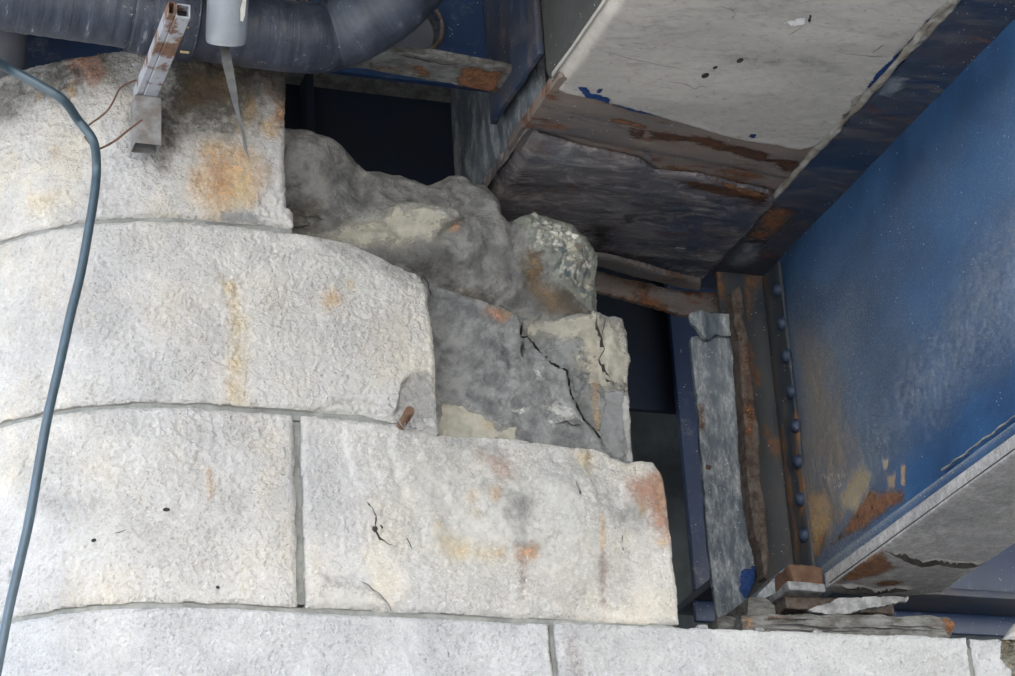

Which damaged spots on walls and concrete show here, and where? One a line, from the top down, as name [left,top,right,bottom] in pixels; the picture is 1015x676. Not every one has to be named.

corrosion [456,67,503,91]
peeling [578,87,664,119]
crack [595,312,615,389]
crack [520,321,603,446]
corrosion [726,287,769,583]
crack [367,502,412,548]
corrosion [631,475,668,536]
corrosion [811,467,904,558]
corrosion [842,552,901,586]